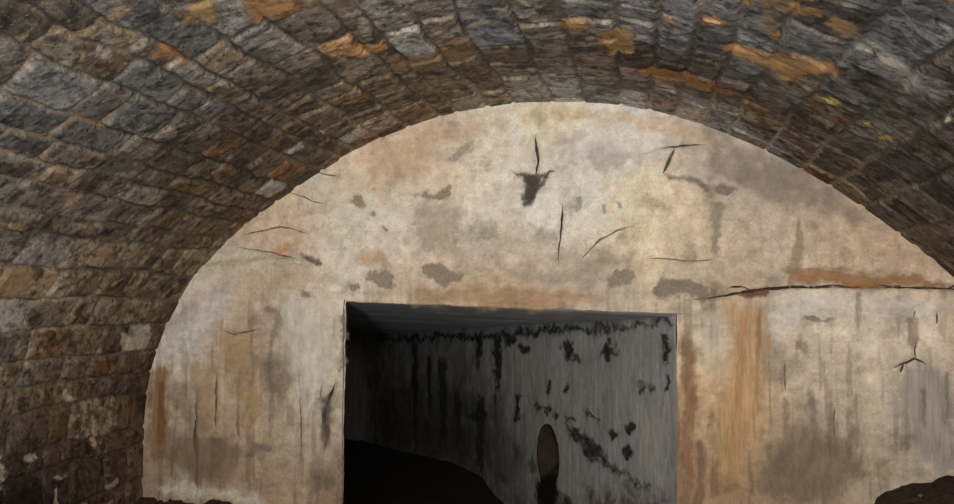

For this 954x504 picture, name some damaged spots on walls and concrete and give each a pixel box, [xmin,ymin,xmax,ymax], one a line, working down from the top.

crack [533,137,541,174]
crack [643,144,704,174]
crack [558,203,631,262]
rust [740,289,768,297]
crack [685,284,954,324]
crack [893,341,926,373]
leakage [368,317,672,490]
leakage [529,457,571,504]